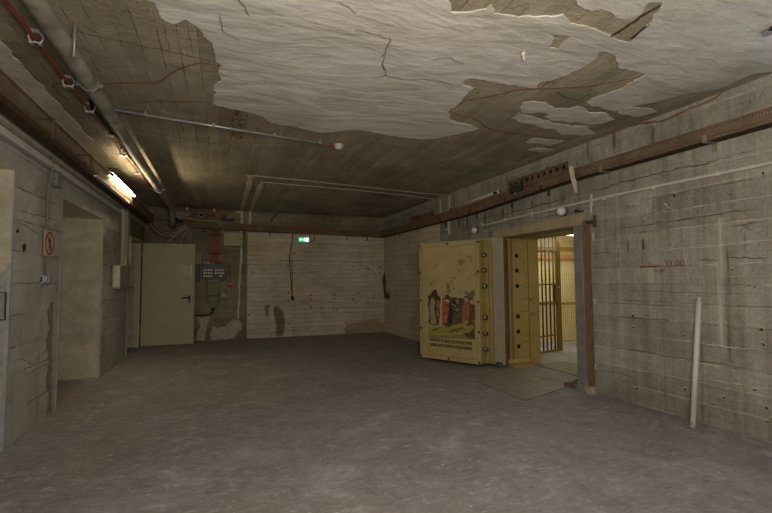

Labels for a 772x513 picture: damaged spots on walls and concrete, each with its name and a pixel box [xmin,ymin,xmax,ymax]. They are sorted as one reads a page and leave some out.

crack [337,1,464,85]
flaking render [148,0,772,139]